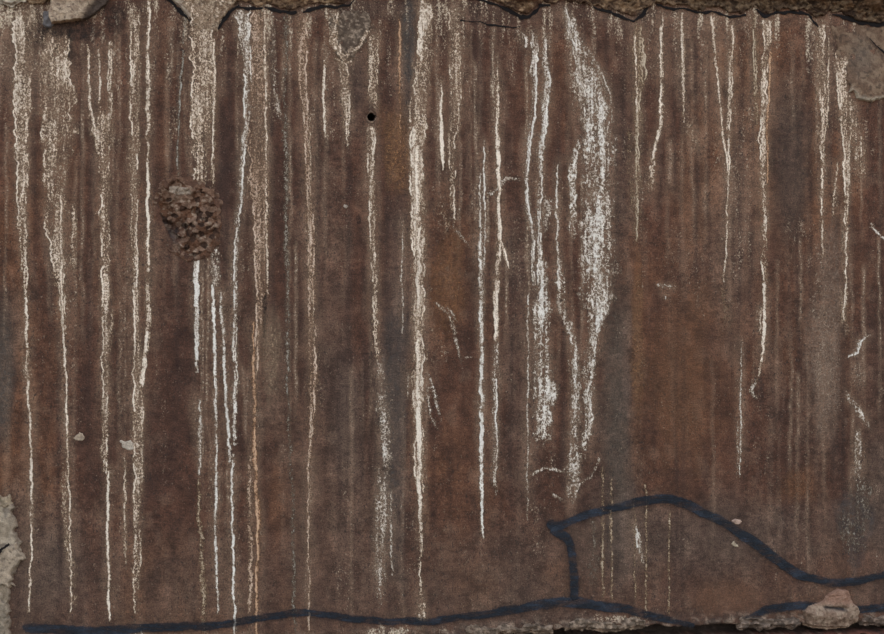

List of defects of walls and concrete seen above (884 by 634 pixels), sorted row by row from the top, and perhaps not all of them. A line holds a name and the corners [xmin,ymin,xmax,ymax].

spalling [0,494,26,634]
peeling [43,0,109,29]
damp [10,0,152,622]
damp [175,13,217,184]
damp [192,5,354,634]
damp [356,0,665,628]
damp [680,9,700,147]
efflorescence [709,13,736,328]
crack [593,4,884,53]
efflorescence [736,12,773,479]
efflorescence [814,20,866,335]
damp [838,391,872,553]